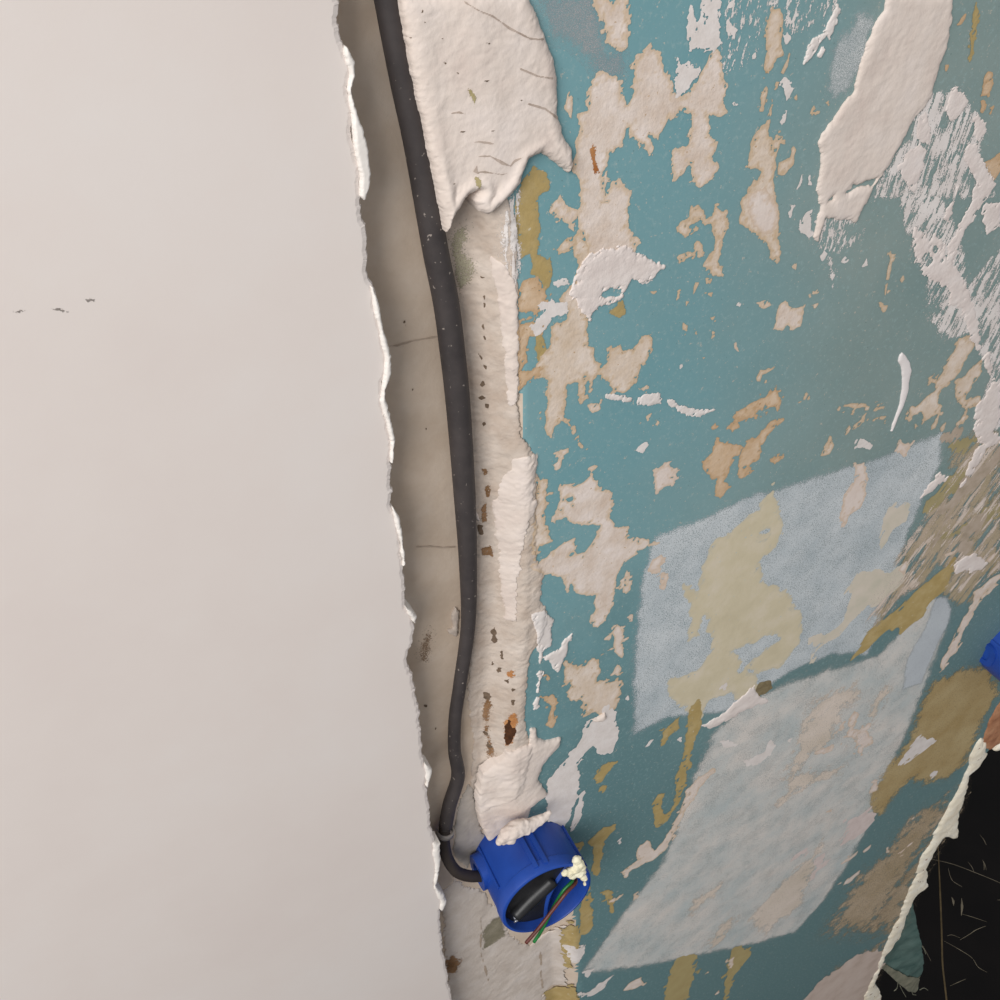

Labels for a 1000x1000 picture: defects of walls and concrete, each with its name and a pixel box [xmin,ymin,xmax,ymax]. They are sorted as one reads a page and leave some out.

peeling [676,6,796,305]
peeling [757,289,819,331]
rust [481,469,491,523]
peeling [620,335,1000,881]
rust [482,699,496,758]
rust [502,713,518,746]
peeling [575,824,616,876]
spalling [804,702,1000,1000]
flaking render [440,878,639,1000]
peeling [623,977,647,991]
peeling [663,954,709,1000]
peeling [715,945,751,1000]